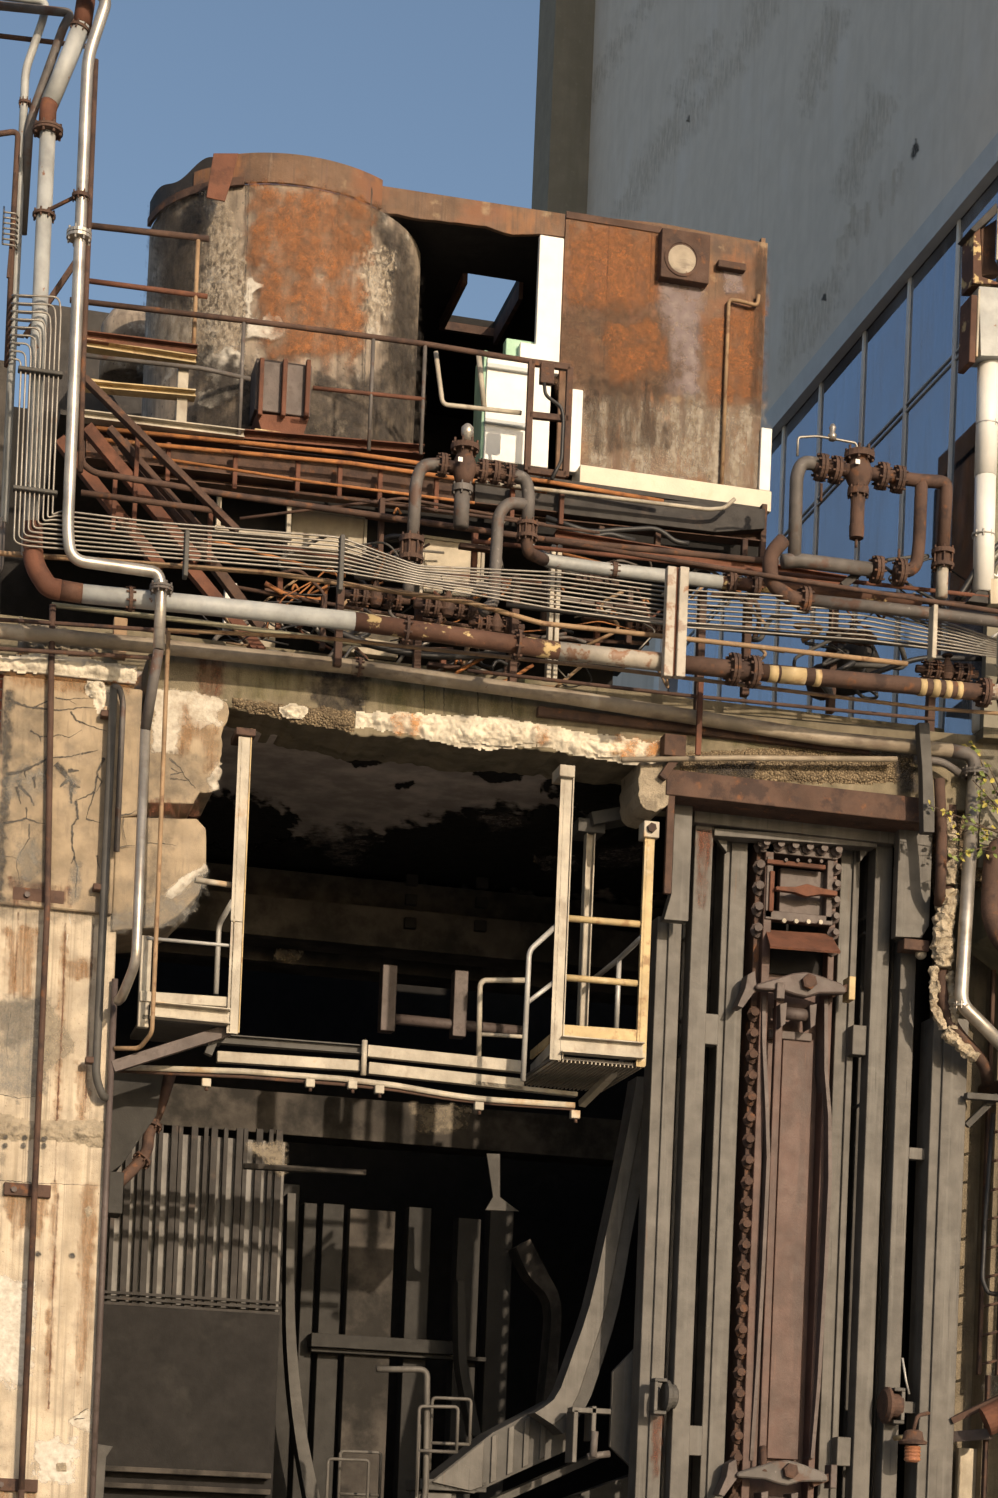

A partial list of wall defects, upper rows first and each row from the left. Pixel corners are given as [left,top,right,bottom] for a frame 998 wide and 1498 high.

corrosion [262,272,368,357]
corrosion [703,251,766,408]
corrosion [586,321,668,452]
spalling [151,689,660,765]
crack [2,697,175,899]
peeling [207,761,221,791]
spalling [165,863,208,899]